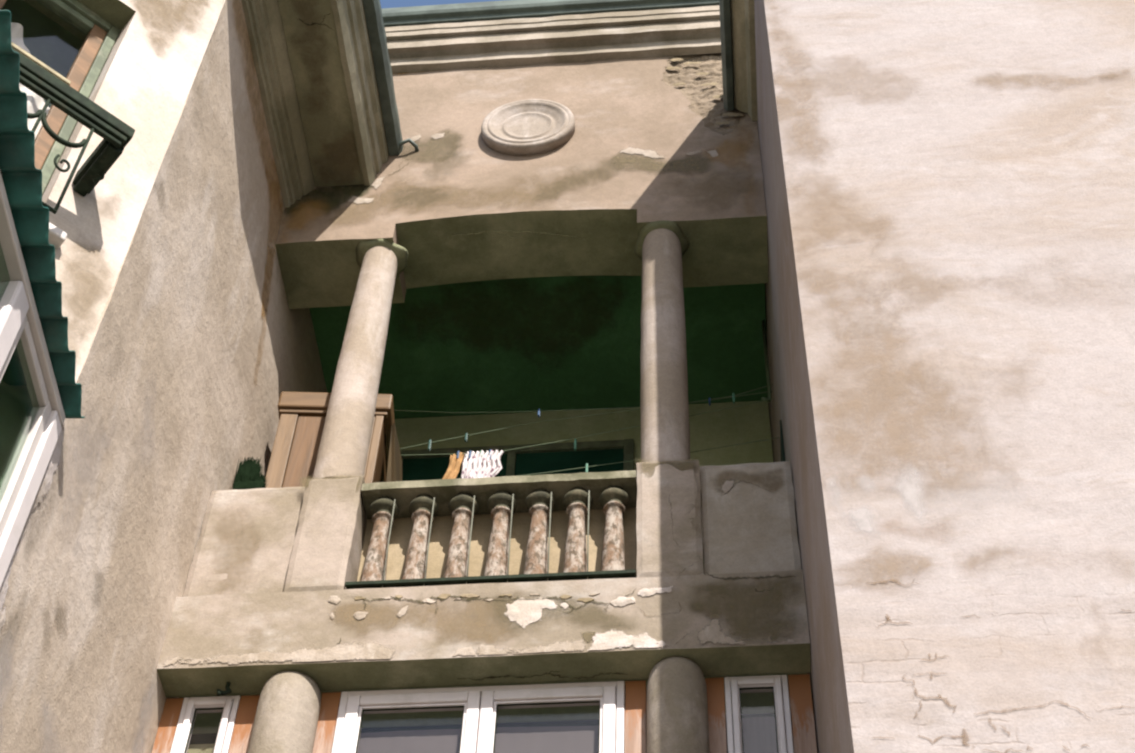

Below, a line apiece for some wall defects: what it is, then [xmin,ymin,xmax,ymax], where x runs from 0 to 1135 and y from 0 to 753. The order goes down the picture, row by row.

spalling [661,53,748,135]
damp [403,132,458,162]
damp [285,138,578,222]
damp [612,154,709,173]
peeling [328,595,408,620]
peeling [422,586,673,628]
damp [692,579,797,640]
peeling [453,629,666,656]
crack [874,653,1121,753]